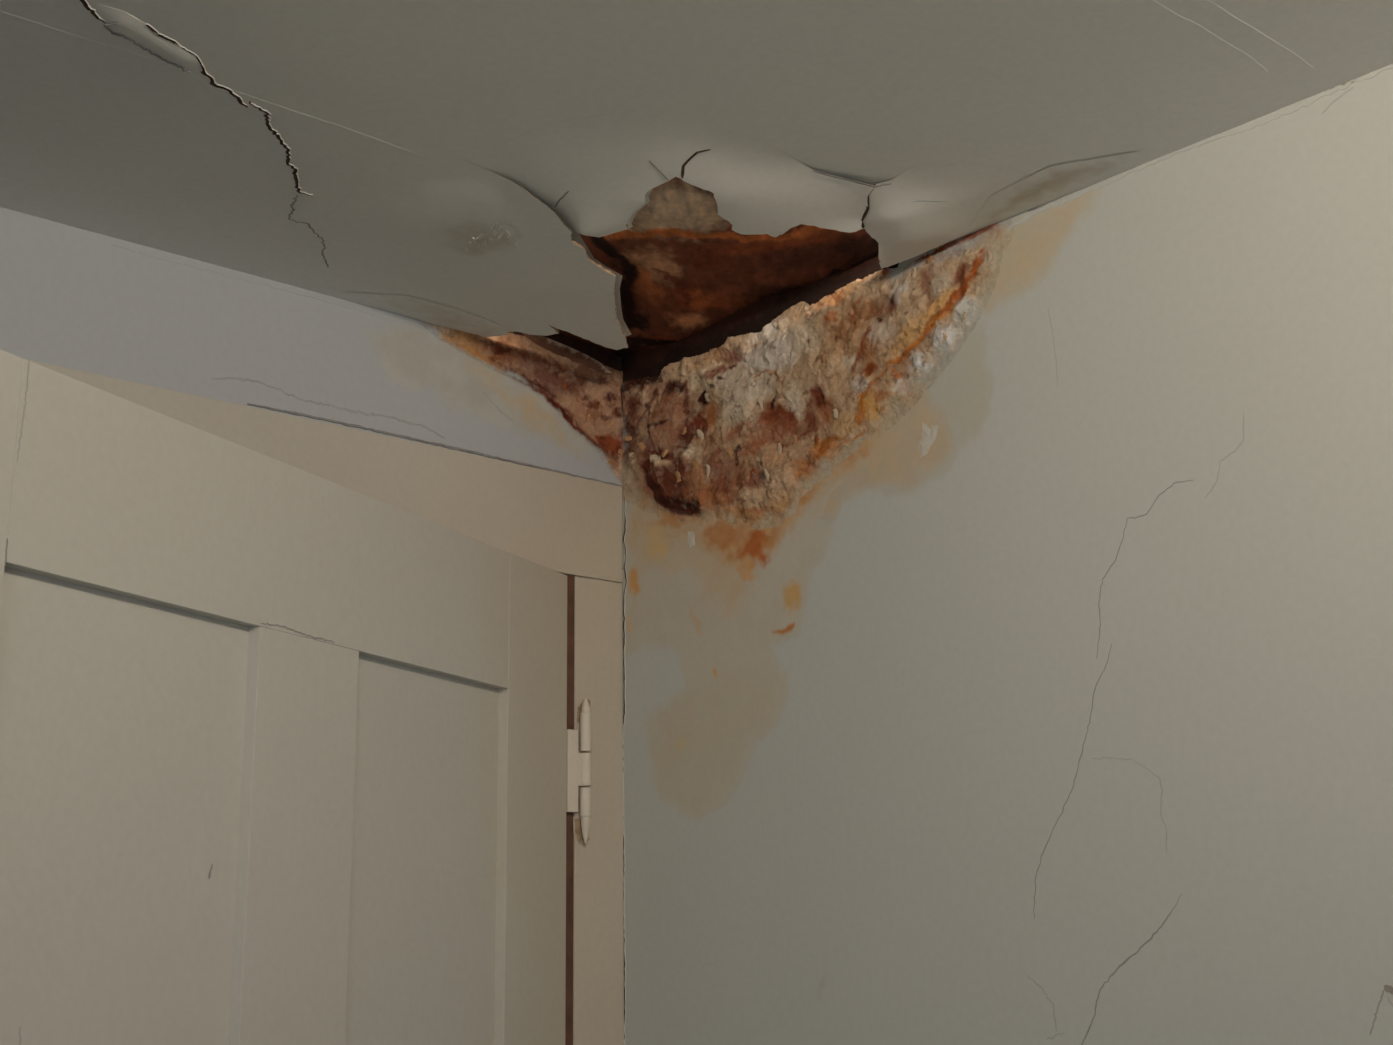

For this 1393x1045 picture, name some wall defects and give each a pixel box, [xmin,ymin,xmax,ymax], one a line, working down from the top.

crack [79,0,329,268]
damp [342,255,899,483]
spalling [413,177,1014,531]
damp [622,151,1138,825]
crack [1033,411,1245,919]
crack [1027,894,1182,1045]